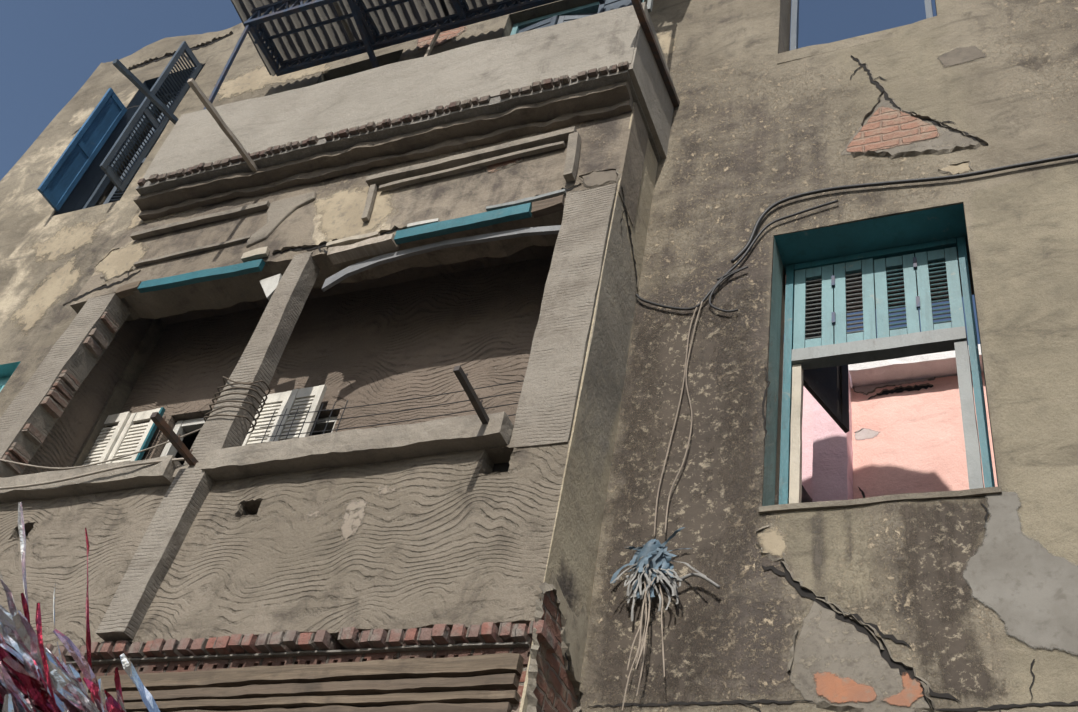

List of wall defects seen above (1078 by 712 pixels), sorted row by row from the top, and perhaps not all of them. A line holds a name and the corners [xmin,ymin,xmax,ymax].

flaking render [218,63,331,99]
flaking render [482,157,524,174]
flaking render [841,91,987,175]
crack [850,55,989,145]
flaking render [10,219,106,335]
flaking render [94,241,149,283]
crack [868,383,933,399]
flaking render [756,525,786,562]
leakage [811,512,824,577]
flaking render [526,571,589,712]
flaking render [787,598,935,712]
crack [762,561,1078,712]